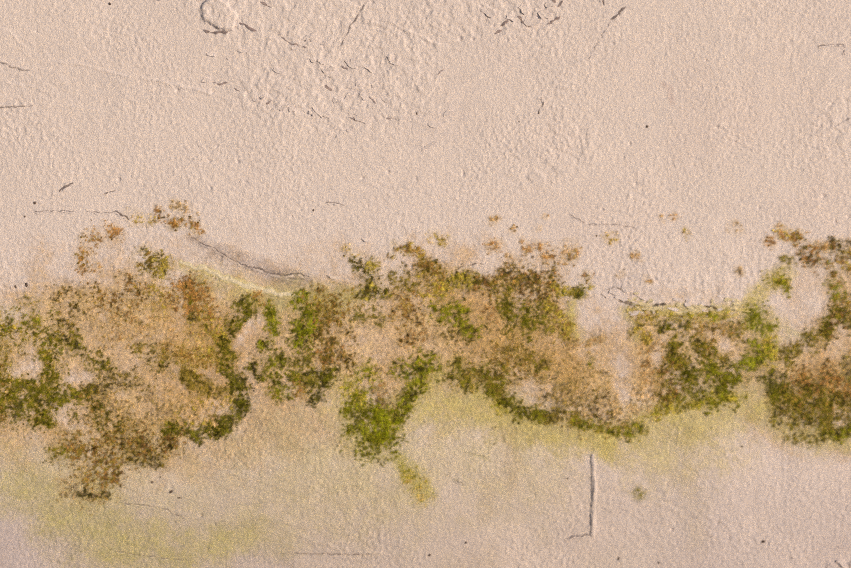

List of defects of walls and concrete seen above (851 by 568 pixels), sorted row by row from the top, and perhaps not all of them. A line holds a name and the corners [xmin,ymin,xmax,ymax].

water stain [132,200,205,240]
peeling [602,283,751,324]
water stain [0,220,851,473]